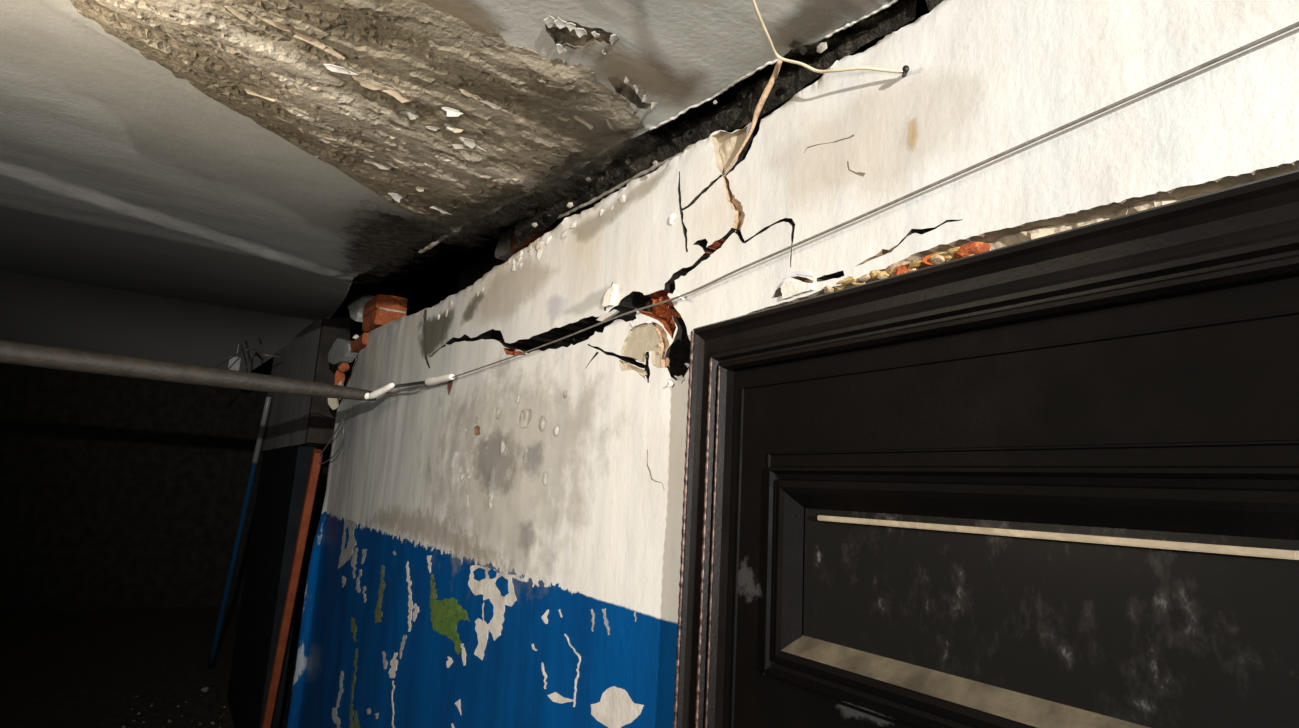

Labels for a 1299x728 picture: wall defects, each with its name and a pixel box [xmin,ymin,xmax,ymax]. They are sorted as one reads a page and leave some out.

peeling [70,0,657,220]
crack [804,134,865,177]
spalling [507,221,577,272]
crack [423,171,795,386]
spalling [742,160,1299,316]
peeling [332,518,526,728]
peeling [531,634,644,728]
peeling [591,608,610,635]